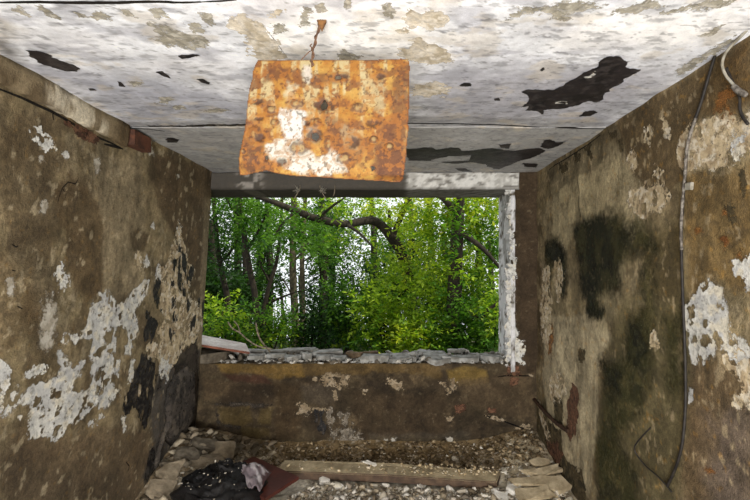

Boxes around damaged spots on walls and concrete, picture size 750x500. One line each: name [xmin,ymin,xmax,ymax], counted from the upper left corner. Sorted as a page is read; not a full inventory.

peeling [25,50,80,72]
crack [0,89,123,150]
peeling [522,56,641,117]
peeling [406,139,564,172]
flaking render [660,111,750,198]
peeling [501,190,526,387]
water stain [545,237,567,299]
water stain [574,212,658,321]
flaking render [731,254,750,291]
flaking render [0,222,203,442]
flaking render [685,278,750,411]
flaking render [296,372,364,441]